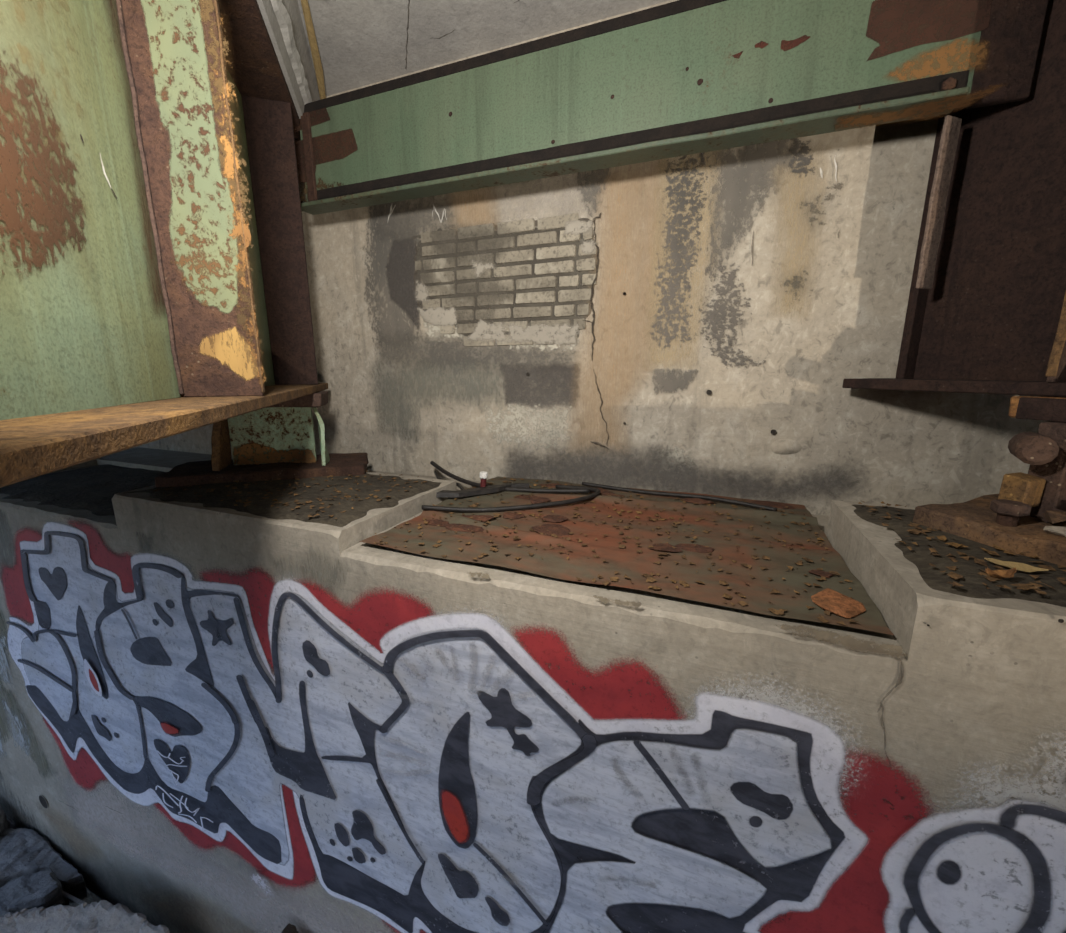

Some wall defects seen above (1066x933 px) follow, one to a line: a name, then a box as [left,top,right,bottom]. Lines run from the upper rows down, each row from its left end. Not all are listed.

crack [403,0,411,69]
peeling [781,35,810,51]
corrosion [888,38,988,81]
corrosion [0,43,86,274]
corrosion [131,135,165,309]
corrosion [148,0,266,393]
spalling [412,213,599,347]
crack [584,213,610,450]
leakage [364,198,852,499]
leakage [650,138,815,368]
crack [748,230,756,266]
crack [877,657,904,767]